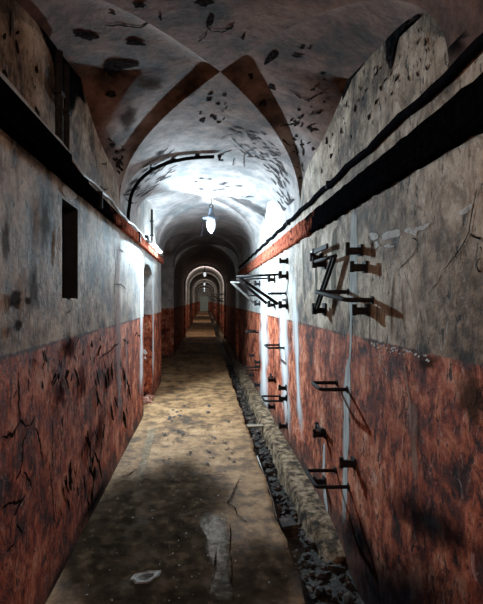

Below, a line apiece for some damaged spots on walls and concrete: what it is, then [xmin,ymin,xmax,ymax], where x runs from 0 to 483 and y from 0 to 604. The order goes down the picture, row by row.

spalling [73,31,100,41]
spalling [103,59,139,77]
spalling [264,51,278,65]
spalling [369,222,431,249]
crack [431,189,481,291]
crack [99,332,141,359]
crack [1,372,57,553]
crack [206,473,248,600]